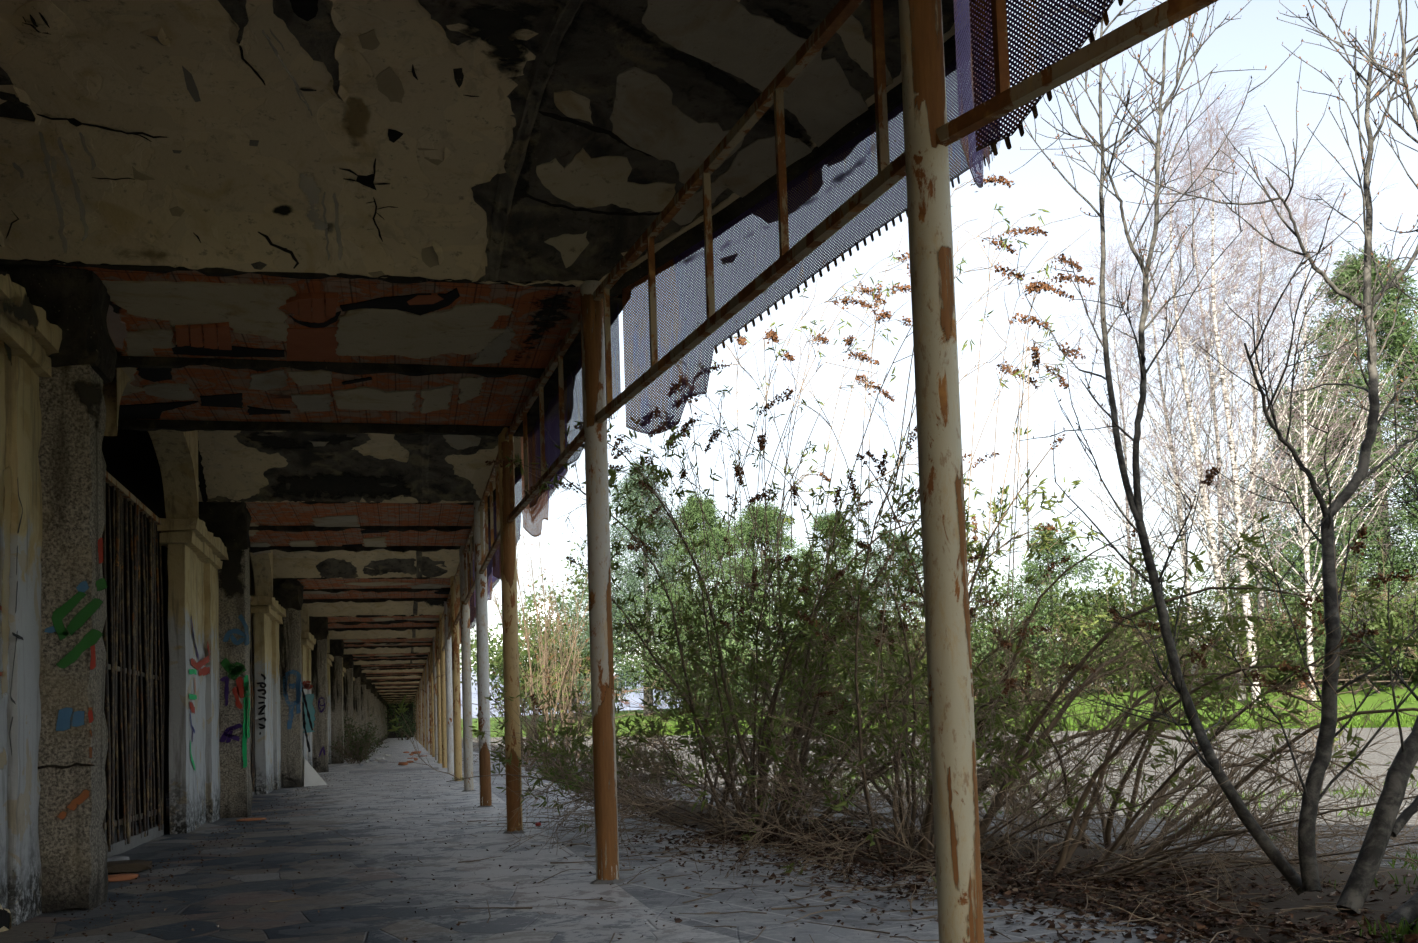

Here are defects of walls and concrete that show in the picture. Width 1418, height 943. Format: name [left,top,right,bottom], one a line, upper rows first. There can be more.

peeling [941,0,959,34]
crack [35,113,167,142]
peeling [273,0,901,328]
rust [908,0,945,148]
crack [258,232,299,269]
crack [337,197,576,287]
rust [937,246,954,342]
peeling [118,393,498,503]
peeling [316,530,450,594]
rust [501,441,516,588]
rust [955,460,973,697]
rust [593,566,619,880]